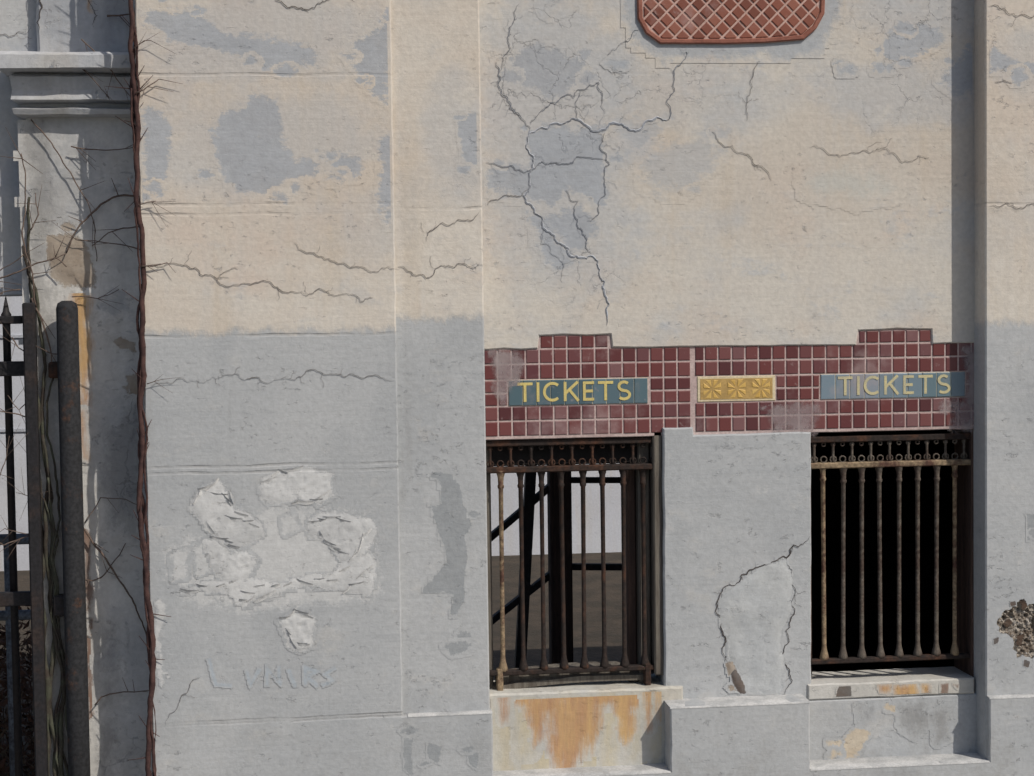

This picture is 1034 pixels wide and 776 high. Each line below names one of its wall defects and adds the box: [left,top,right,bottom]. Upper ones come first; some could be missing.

crack [0,0,50,39]
crack [421,5,687,323]
crack [812,142,924,162]
crack [153,250,367,302]
crack [294,242,478,278]
peeling [180,464,379,603]
peeling [274,607,319,656]
crack [714,536,810,691]
spalling [993,599,1034,668]
corrosion [493,691,662,769]